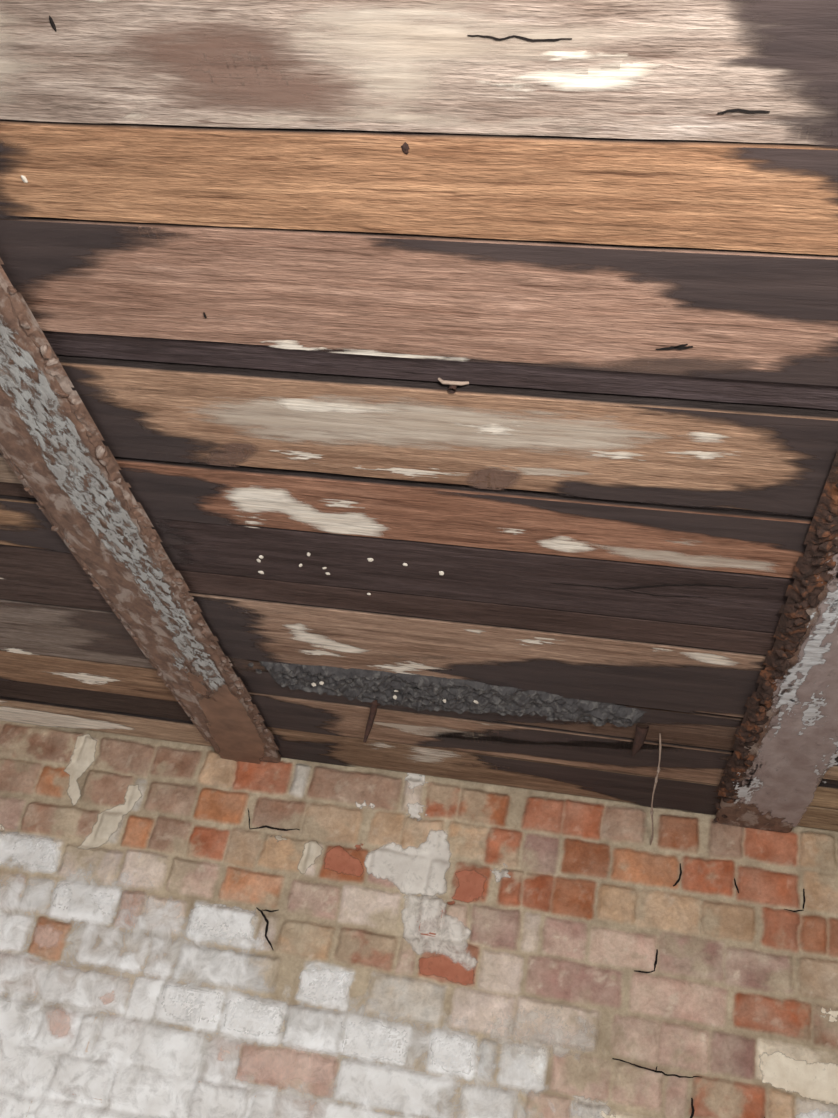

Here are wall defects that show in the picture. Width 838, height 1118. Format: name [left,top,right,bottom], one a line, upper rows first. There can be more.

peeling [0,320,225,691]
peeling [326,499,357,508]
peeling [301,649,343,657]
peeling [367,661,437,675]
rust [714,450,838,822]
peeling [733,546,838,827]
peeling [405,773,427,789]
peeling [407,803,427,821]
crack [256,907,278,950]
peeling [0,833,543,1118]
crack [612,1058,699,1118]